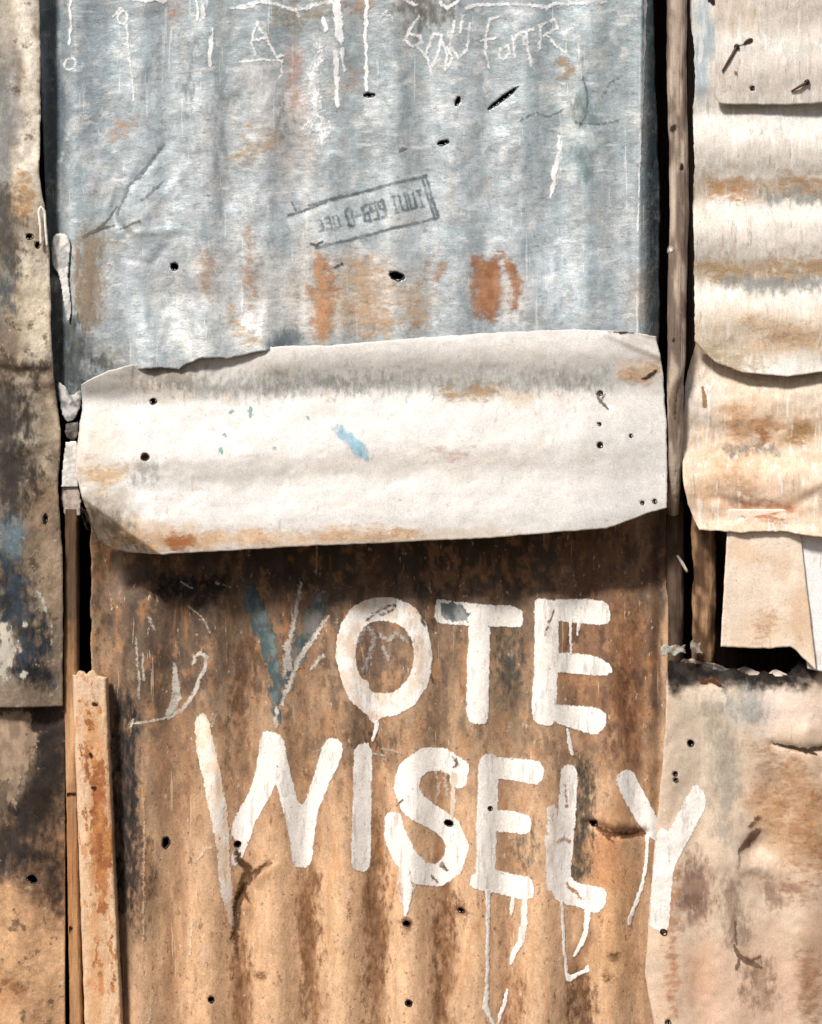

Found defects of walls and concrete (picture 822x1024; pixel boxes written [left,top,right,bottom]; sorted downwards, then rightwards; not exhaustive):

corrosion [307,253,393,346]
corrosion [470,253,522,319]
leakage [0,236,112,687]
corrosion [738,479,793,519]
corrosion [107,527,416,553]